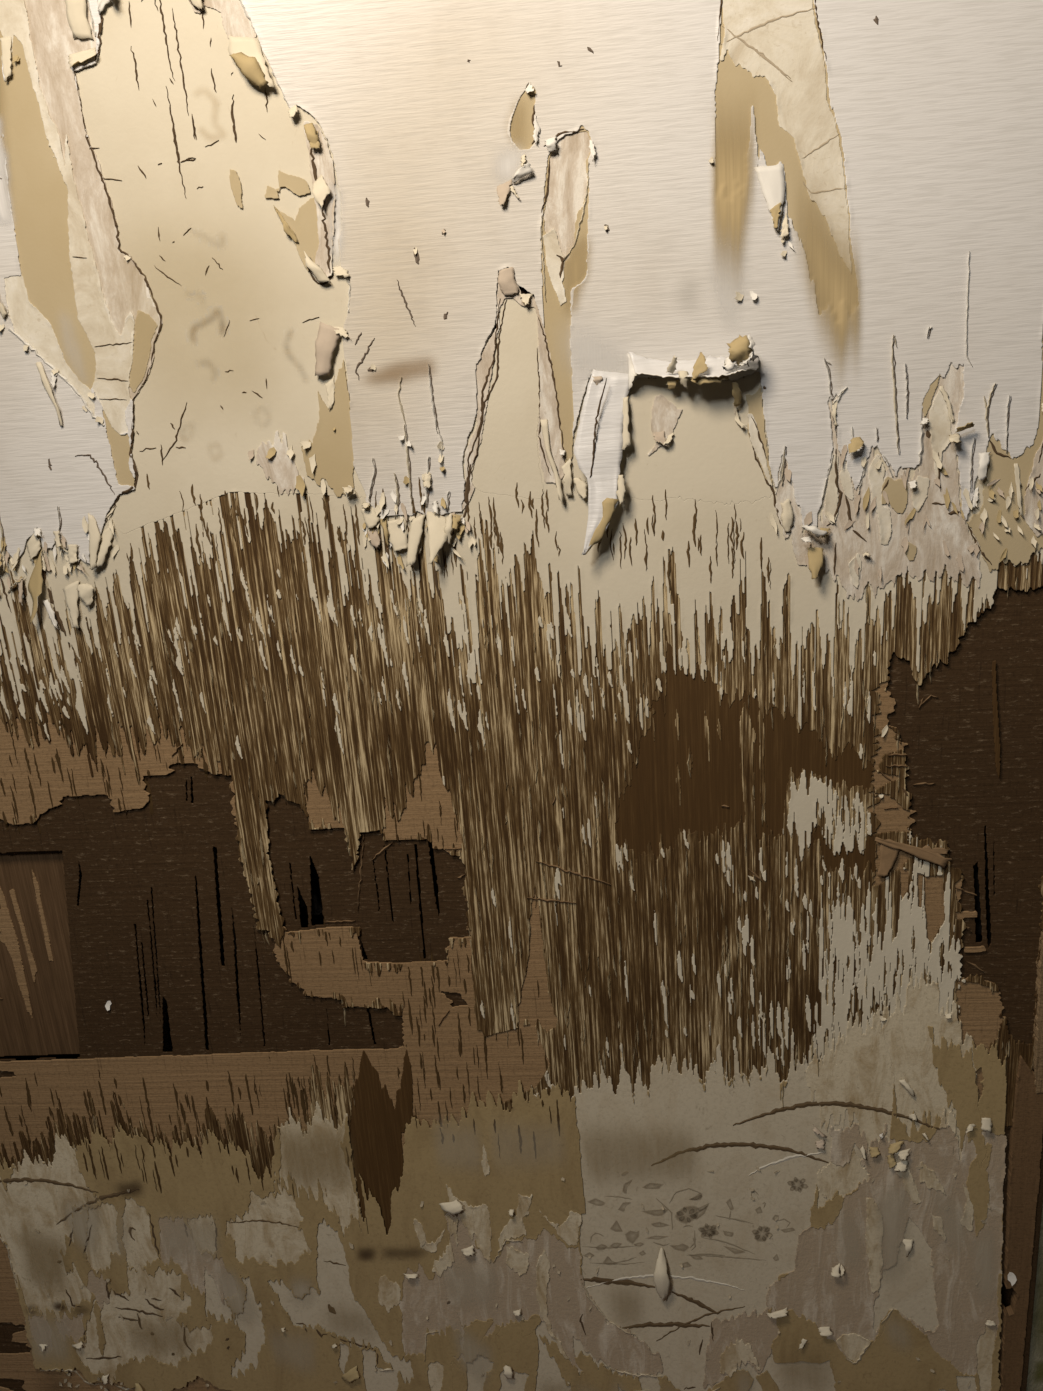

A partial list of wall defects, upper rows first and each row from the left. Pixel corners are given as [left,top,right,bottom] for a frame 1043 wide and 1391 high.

peeling [0,0,376,534]
peeling [462,83,1043,601]
peeling [708,0,859,354]
damp [0,870,54,1018]